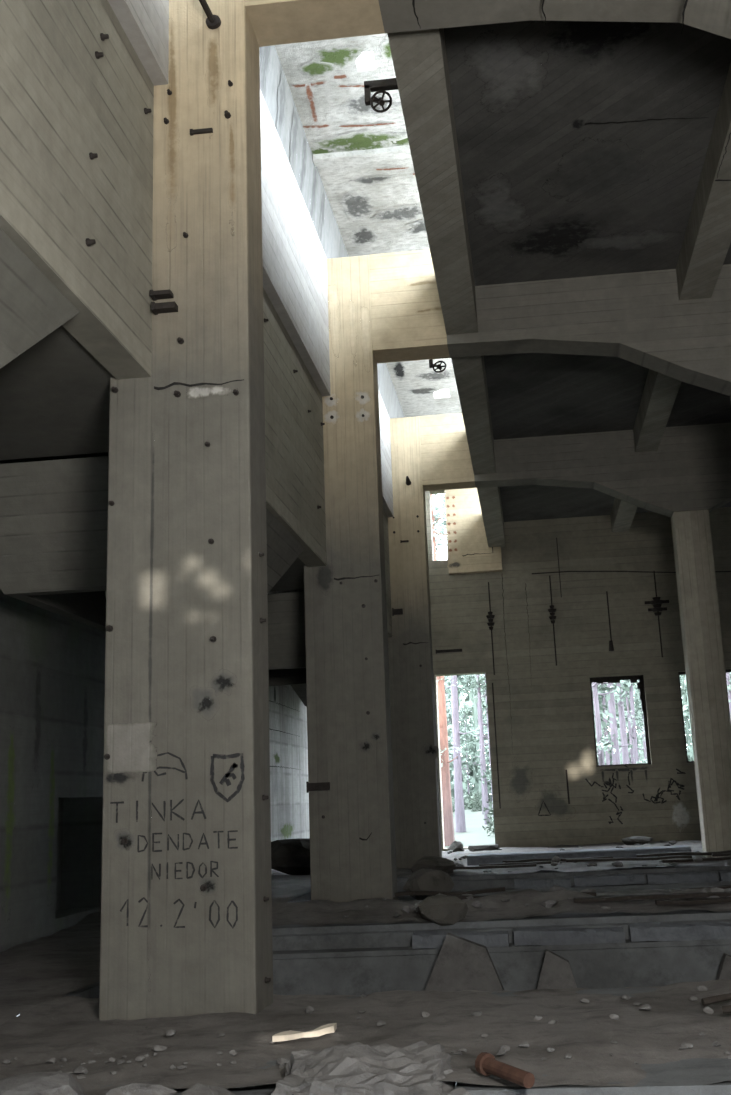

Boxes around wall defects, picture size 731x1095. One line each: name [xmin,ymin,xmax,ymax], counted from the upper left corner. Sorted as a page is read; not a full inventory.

damp [340,91,401,115]
damp [260,46,325,244]
damp [339,176,426,246]
crack [154,379,244,390]